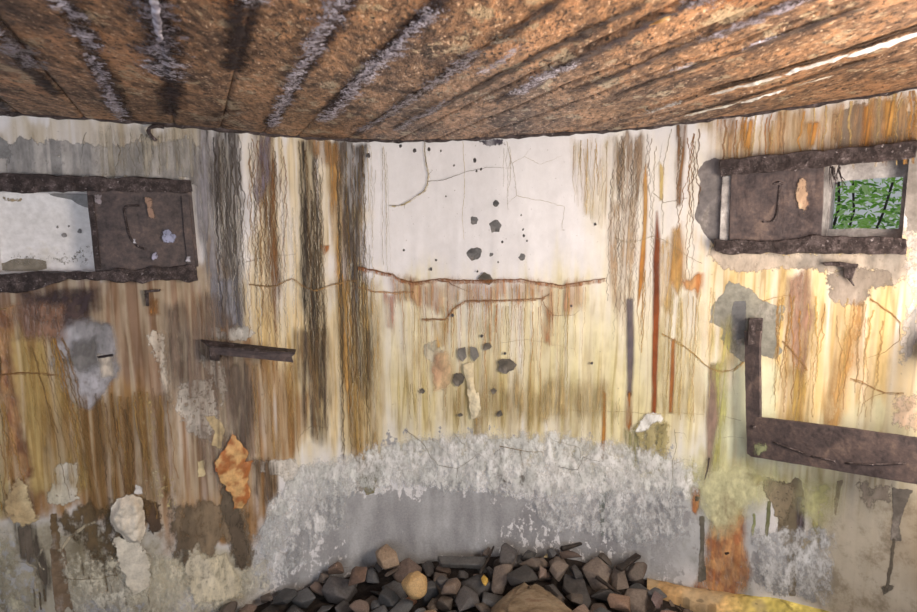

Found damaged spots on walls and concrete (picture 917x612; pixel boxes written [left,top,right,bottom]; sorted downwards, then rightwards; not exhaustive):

rust [717,110,787,160]
rust [797,90,917,151]
crack [389,142,565,233]
rust [796,178,809,210]
crack [249,267,606,329]
rust [637,167,702,414]
peeling [729,301,746,340]
leakage [0,126,387,612]
leakage [892,394,917,431]
rust [694,502,749,594]
leakage [882,487,913,595]